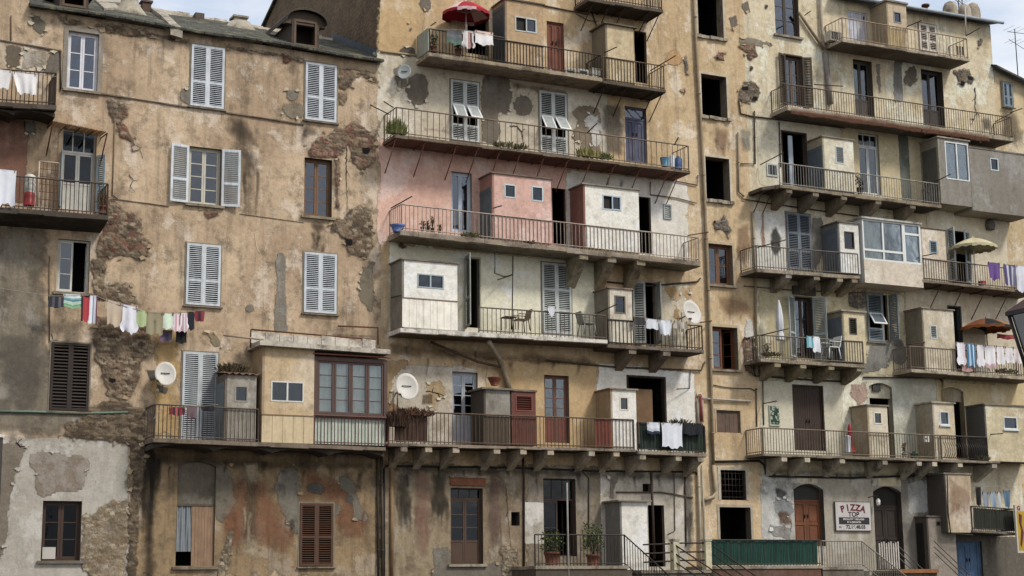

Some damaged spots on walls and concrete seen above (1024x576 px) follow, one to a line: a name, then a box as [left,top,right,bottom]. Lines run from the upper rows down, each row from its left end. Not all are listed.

peeling [6,45,60,75]
spalling [107,99,143,151]
spalling [714,1,774,105]
spalling [953,68,975,86]
spalling [90,199,152,306]
spalling [304,121,380,312]
spalling [713,215,731,238]
peeling [850,326,907,405]
spalling [58,316,168,576]
peeling [0,441,90,557]